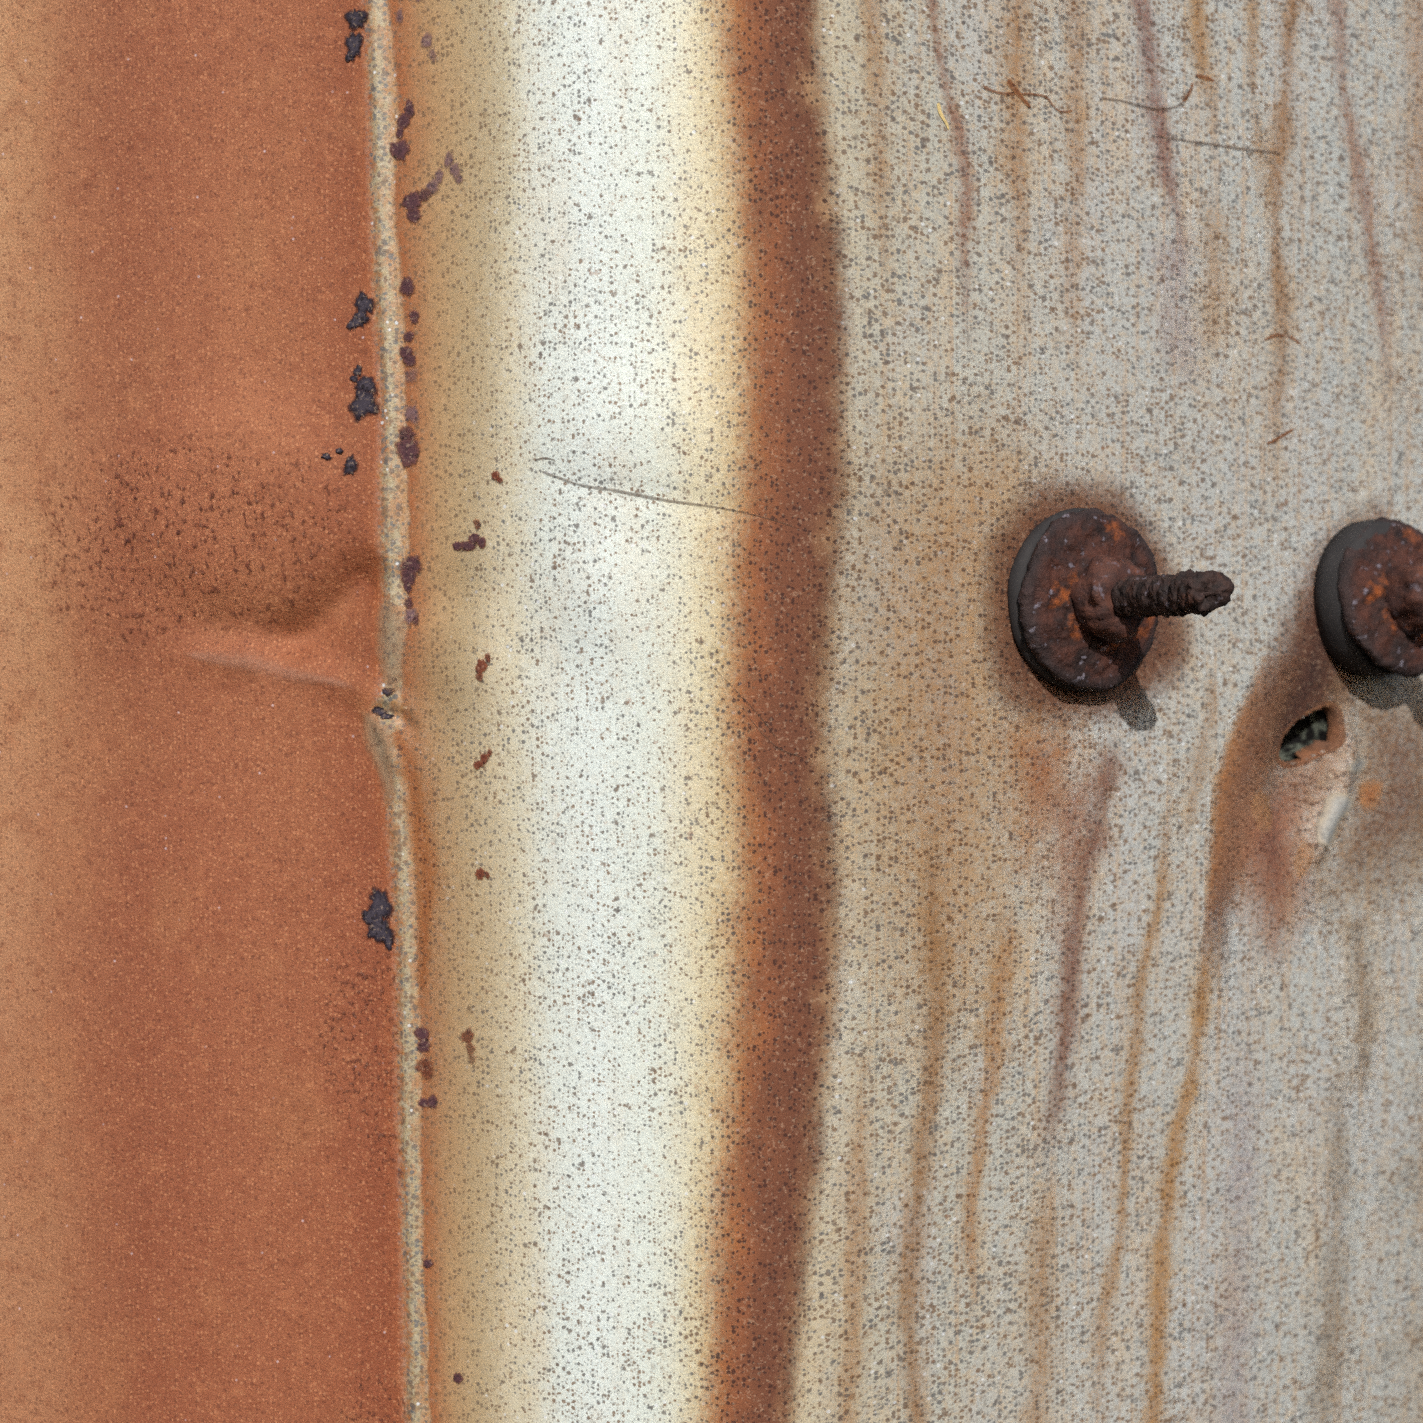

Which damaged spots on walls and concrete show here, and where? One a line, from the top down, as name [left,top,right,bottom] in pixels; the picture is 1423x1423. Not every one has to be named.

corrosion [344,8,368,62]
corrosion [1151,97,1174,192]
corrosion [346,290,374,330]
corrosion [347,364,380,422]
corrosion [321,447,359,476]
peeling [364,713,394,801]
corrosion [702,0,849,1423]
corrosion [1207,565,1423,938]
corrosion [361,886,396,951]
corrosion [874,462,1185,1423]
corrosion [1194,970,1209,1049]
corrosion [1149,1068,1197,1423]